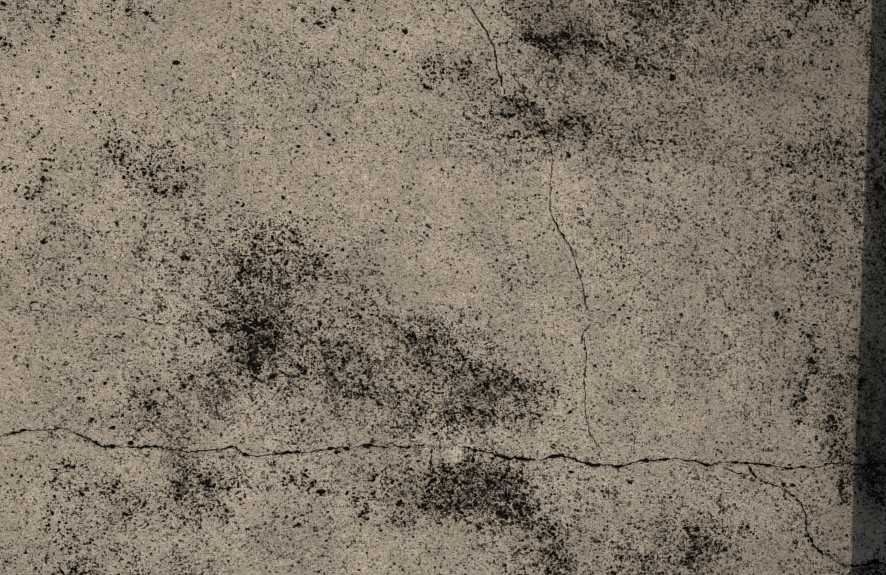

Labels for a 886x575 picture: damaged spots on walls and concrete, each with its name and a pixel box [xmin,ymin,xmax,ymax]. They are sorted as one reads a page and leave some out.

crack [0,427,440,468]
crack [461,0,886,569]